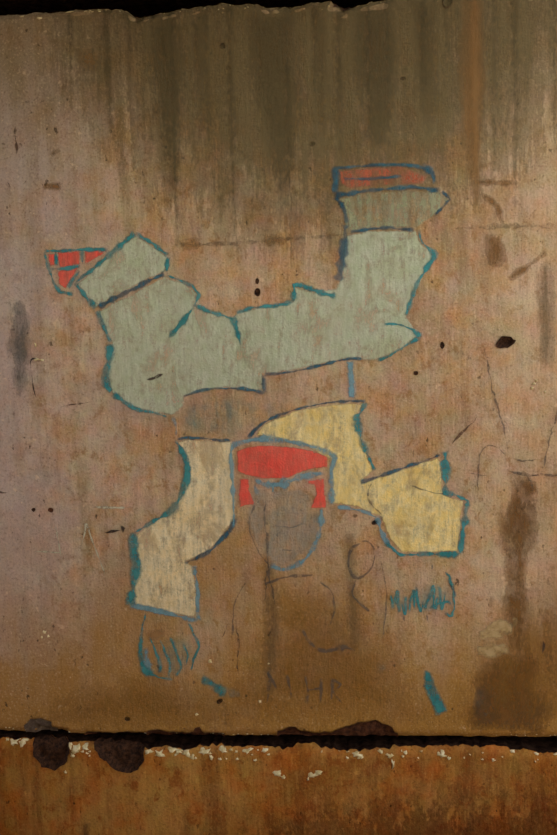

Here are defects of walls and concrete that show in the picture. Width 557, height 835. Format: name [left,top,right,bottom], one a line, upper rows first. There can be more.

water stain [78,0,557,215]
crack [471,350,557,489]
water stain [68,732,91,757]
water stain [145,745,270,761]